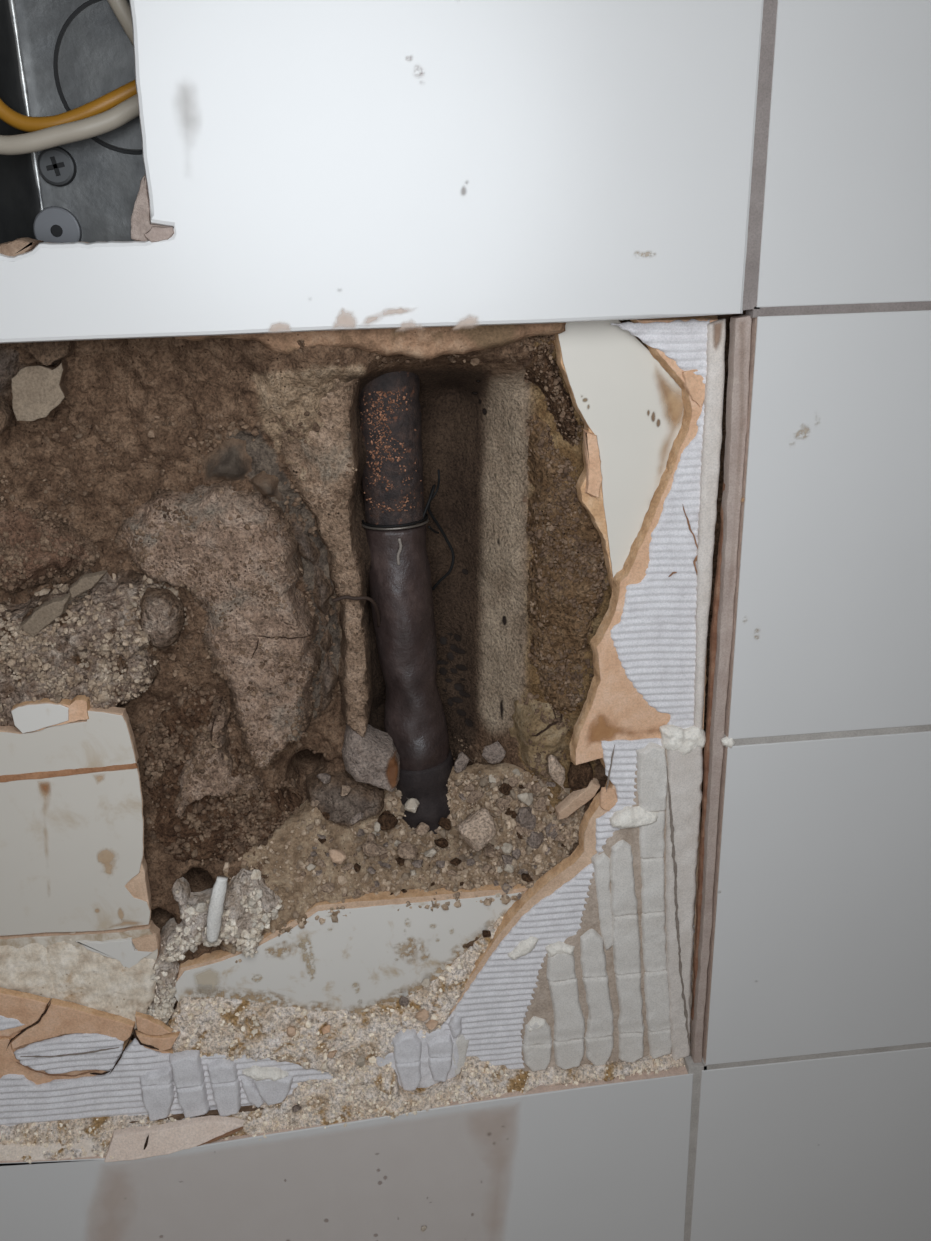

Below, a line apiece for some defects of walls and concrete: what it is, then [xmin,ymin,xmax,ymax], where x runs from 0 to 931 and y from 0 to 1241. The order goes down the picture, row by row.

peeling [271,324,289,332]
peeling [335,309,415,329]
spalling [0,341,76,434]
peeling [682,369,705,407]
corrosion [361,390,422,513]
spalling [505,336,609,785]
spalling [0,376,400,1024]
peeling [555,778,618,820]